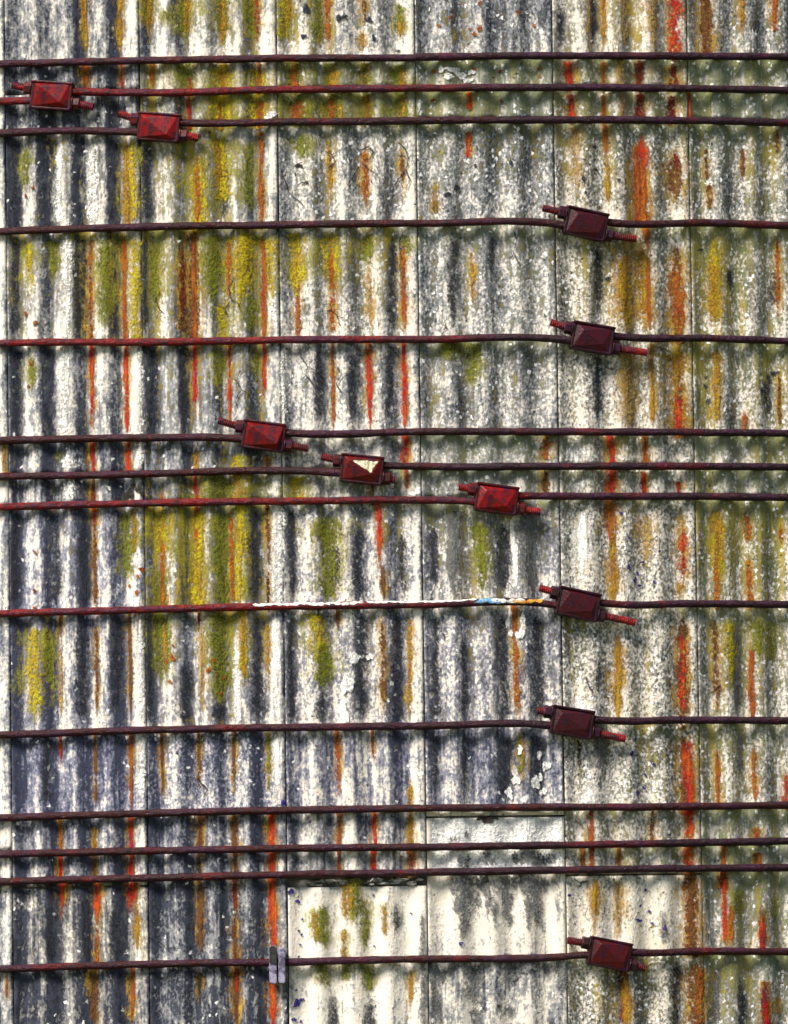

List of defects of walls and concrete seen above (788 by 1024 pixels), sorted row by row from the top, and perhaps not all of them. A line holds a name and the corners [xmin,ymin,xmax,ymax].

rust [645,0,721,126]
water stain [9,237,20,332]
water stain [70,237,87,327]
rust [174,157,205,412]
rust [605,136,692,440]
water stain [246,514,264,600]
rust [601,436,657,601]
water stain [145,619,154,720]
water stain [178,662,193,721]
water stain [248,618,268,722]
rust [263,814,280,947]
rust [670,619,724,1024]